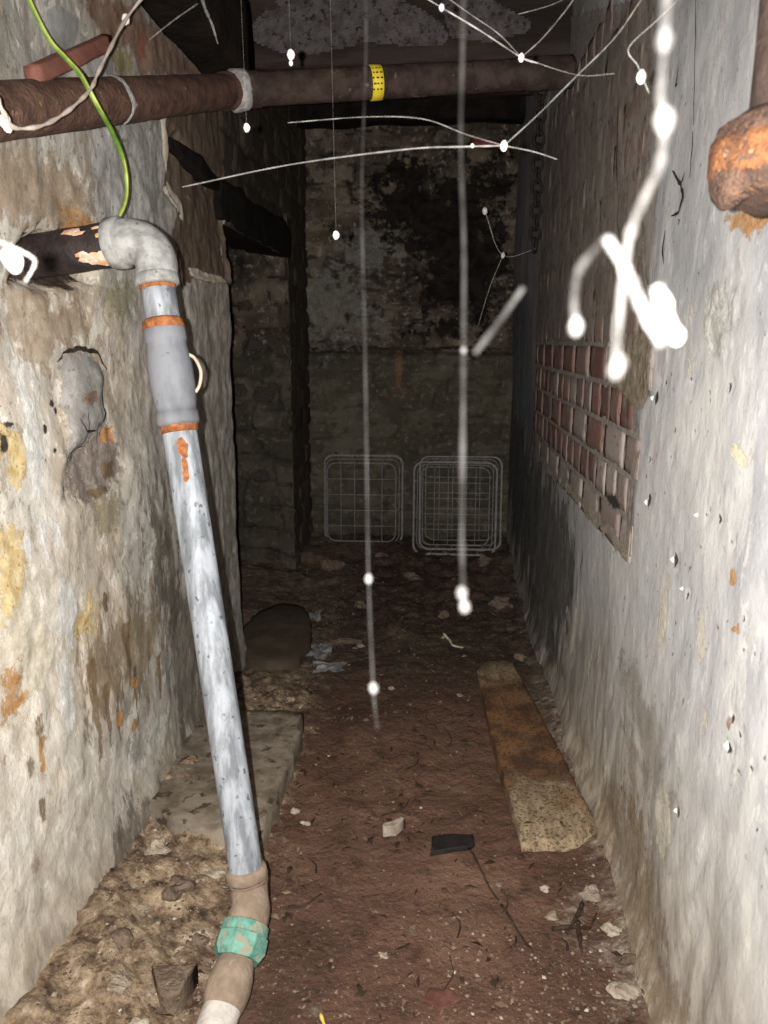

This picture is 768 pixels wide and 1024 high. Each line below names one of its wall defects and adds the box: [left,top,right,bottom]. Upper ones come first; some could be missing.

corrosion [724,210,768,241]
flaking render [531,0,667,563]
spalling [62,418,124,507]
corrosion [1,658,29,726]
corrosion [27,715,46,778]